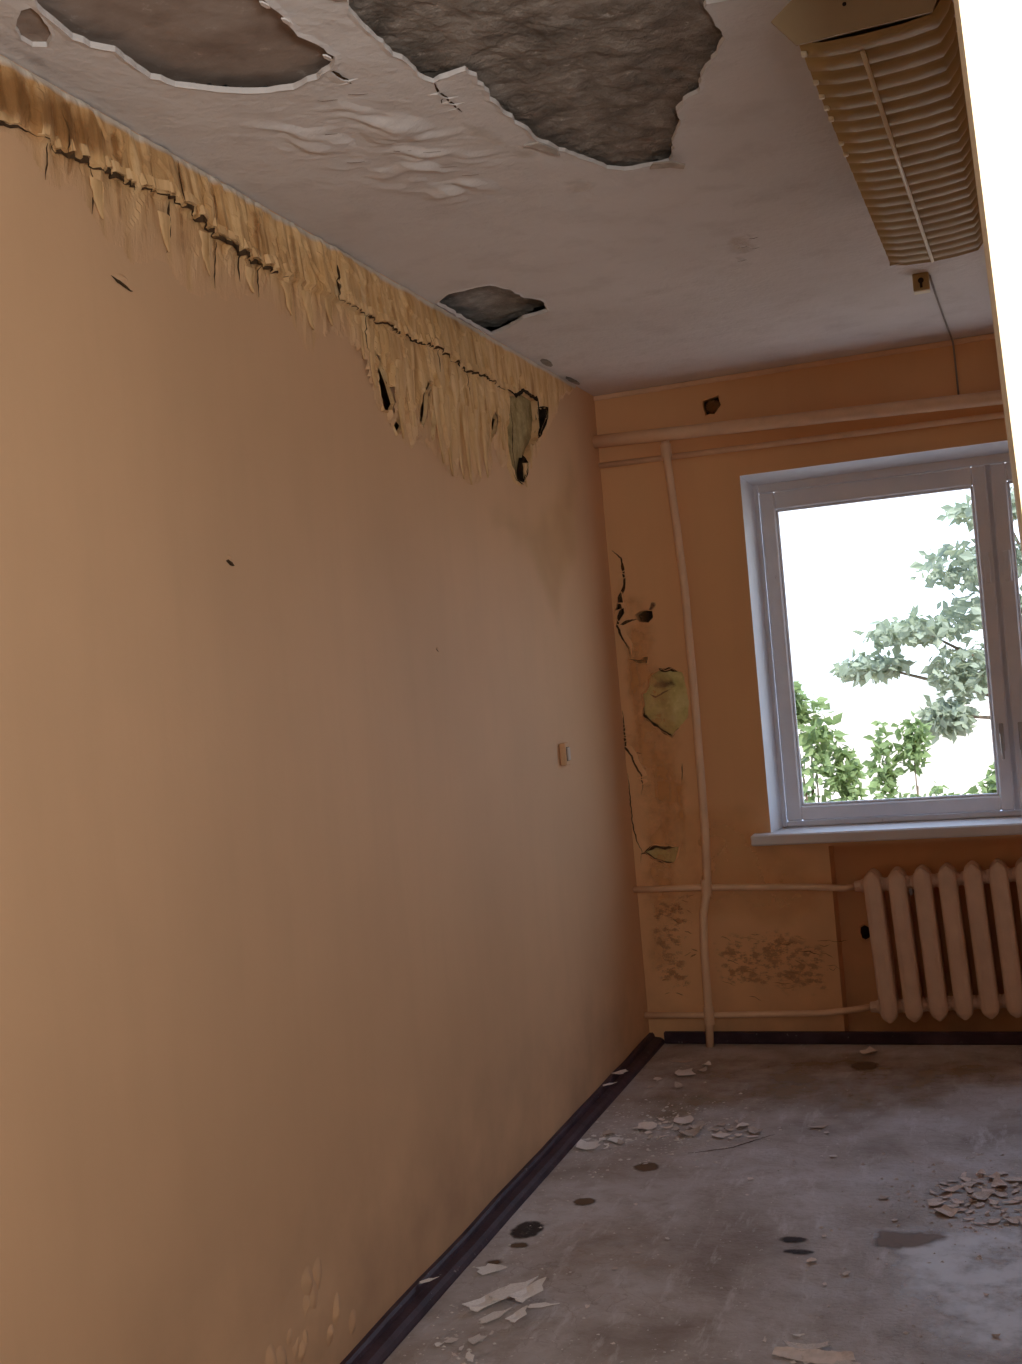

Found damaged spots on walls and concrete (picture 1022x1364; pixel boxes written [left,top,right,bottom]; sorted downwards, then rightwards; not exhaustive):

flaking render [12,0,342,95]
flaking render [332,0,733,171]
crack [0,111,289,292]
peeling [0,55,580,487]
crack [336,265,516,393]
crack [612,545,637,658]
peeling [627,656,691,737]
crack [622,710,648,863]
water stain [875,1229,1022,1352]